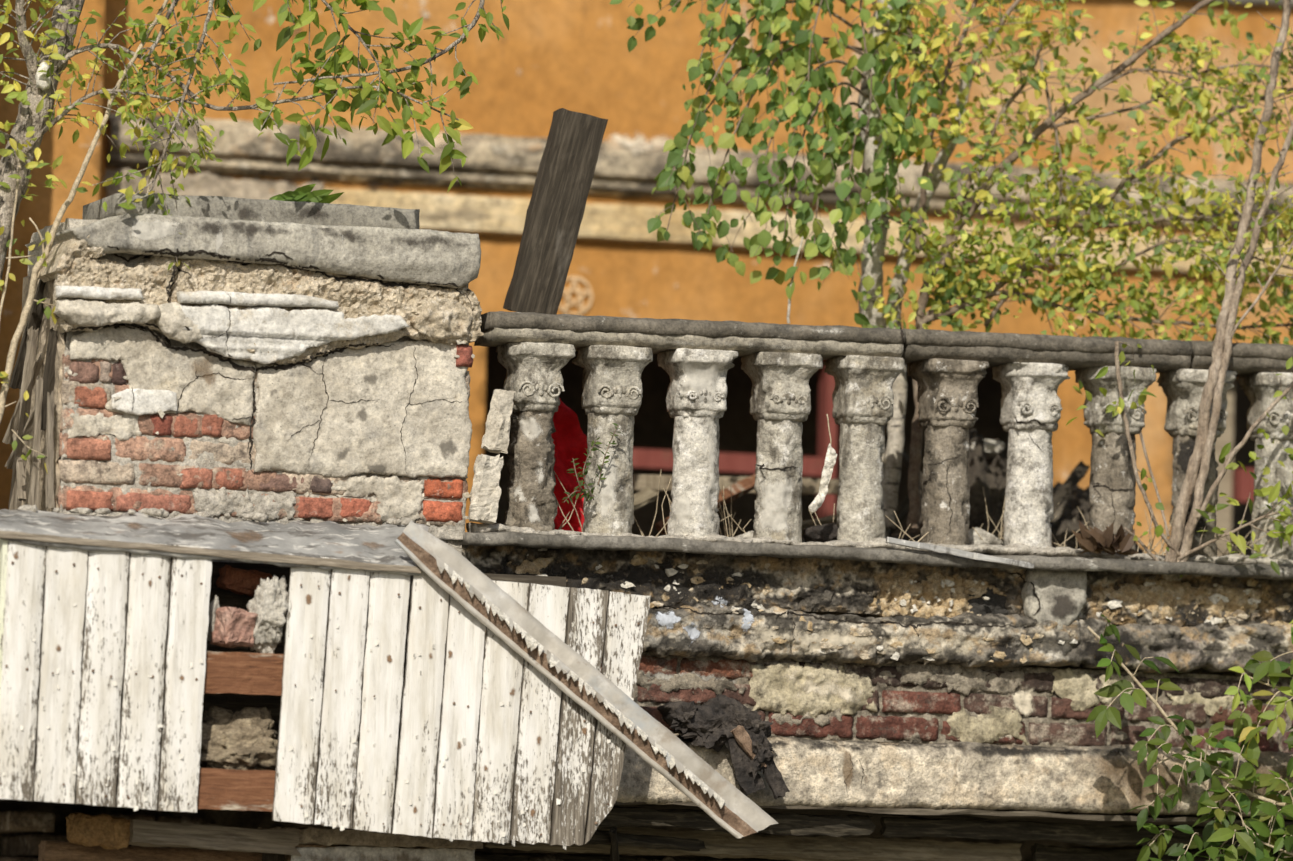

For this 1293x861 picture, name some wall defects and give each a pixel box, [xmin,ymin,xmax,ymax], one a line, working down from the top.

spalling [39,235,107,282]
flaking render [67,355,128,409]
crack [61,246,472,476]
flaking render [61,430,111,463]
flaking render [150,409,231,444]
flaking render [66,459,377,522]
damp [495,557,770,608]
damp [1177,600,1219,628]